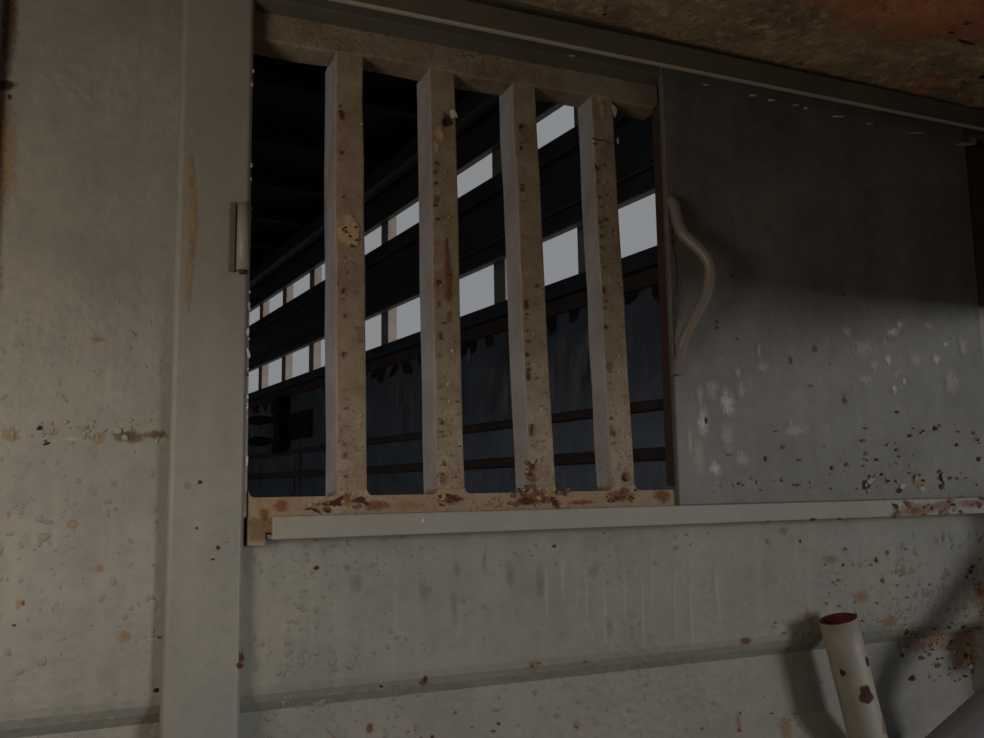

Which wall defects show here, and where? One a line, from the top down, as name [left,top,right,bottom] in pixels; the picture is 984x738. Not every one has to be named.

rust [300,493,386,514]
rust [439,476,465,506]
rust [508,459,591,509]
rust [606,472,637,503]
peeling [856,442,984,517]